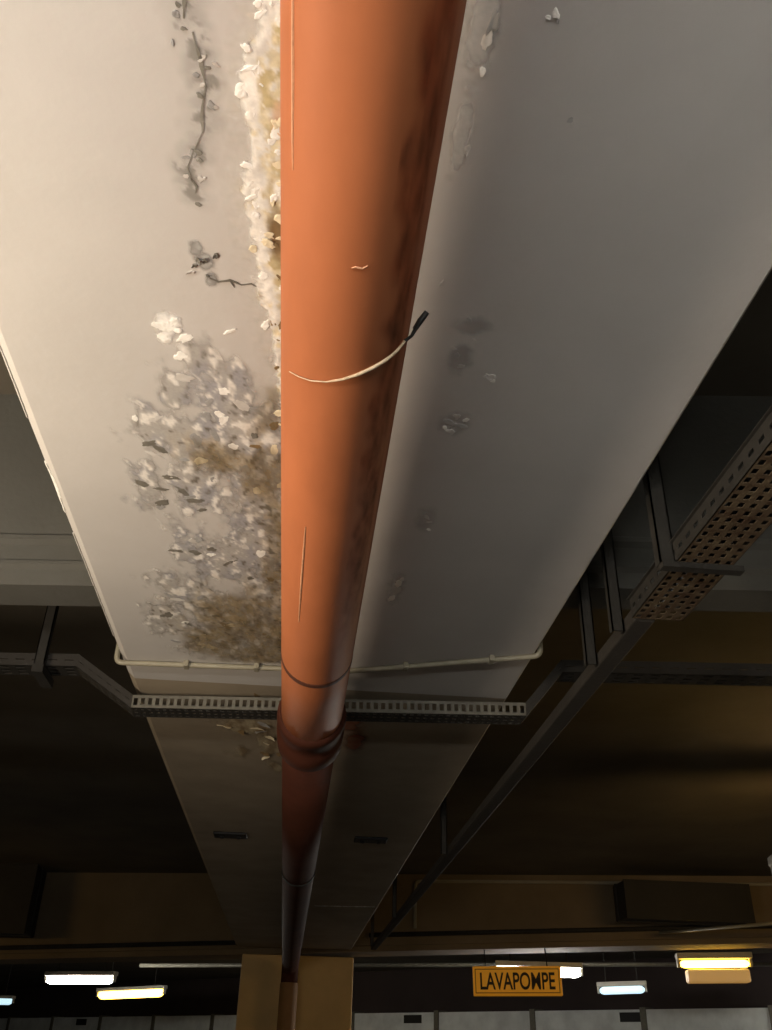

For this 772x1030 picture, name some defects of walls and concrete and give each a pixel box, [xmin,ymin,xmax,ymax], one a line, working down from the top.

leakage [235,0,281,426]
peeling [126,313,281,664]
leakage [187,567,281,662]
leakage [198,447,281,494]